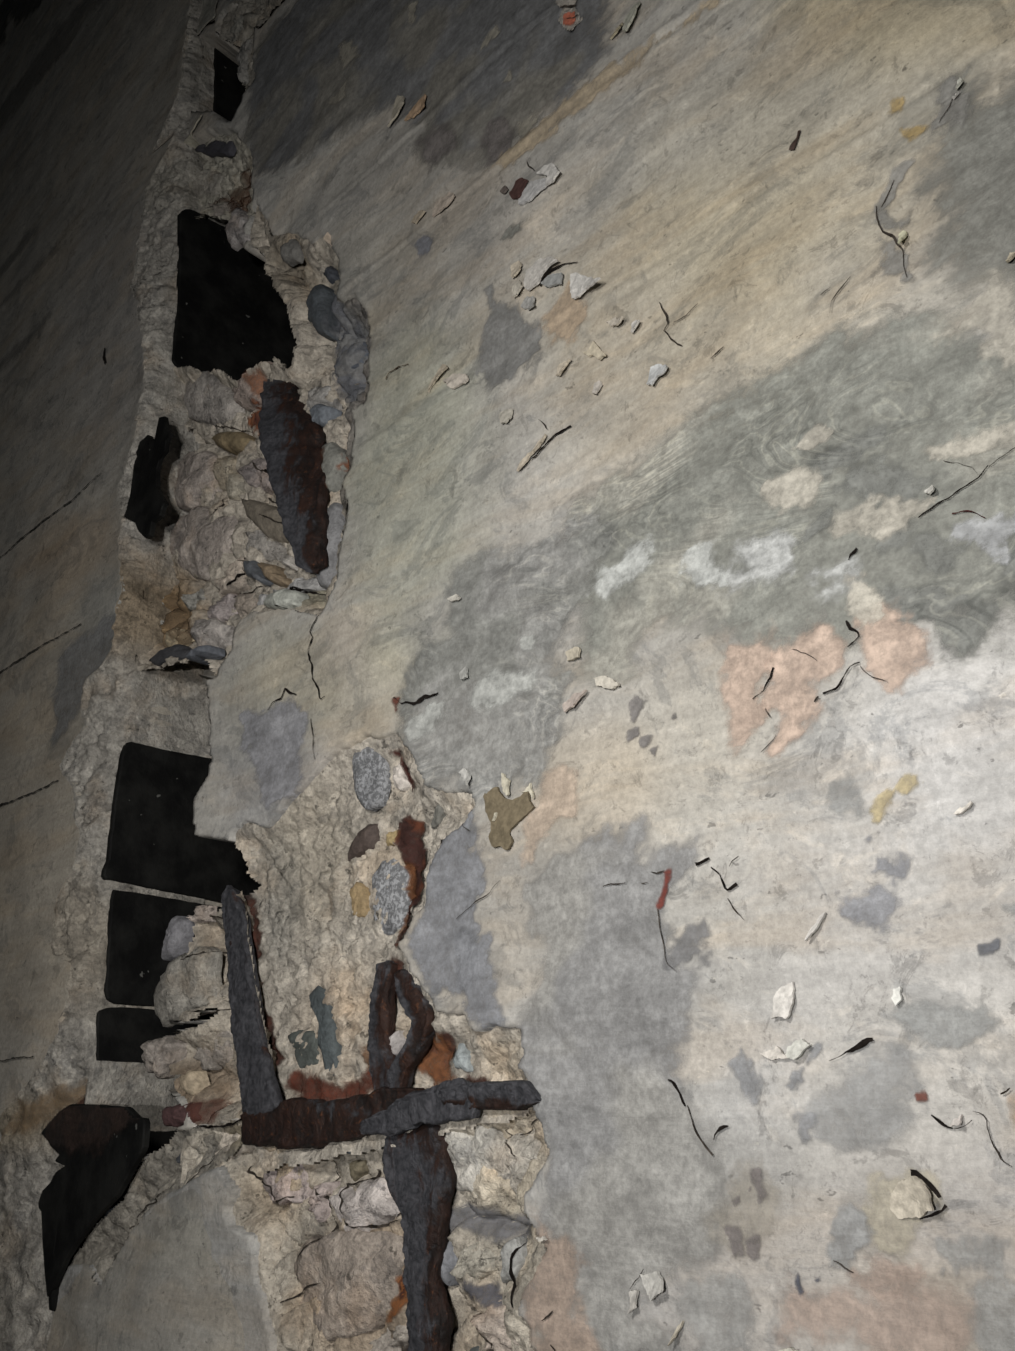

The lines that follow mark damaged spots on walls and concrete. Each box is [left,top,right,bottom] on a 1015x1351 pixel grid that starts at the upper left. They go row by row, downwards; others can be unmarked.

leakage [244,0,652,176]
peeling [500,163,560,205]
crack [876,181,907,277]
crack [918,447,1015,518]
spalling [0,0,550,1351]
crack [268,615,325,759]
peeling [562,676,620,712]
leakage [399,72,1015,1351]
crack [0,780,58,806]
corrosion [656,869,671,909]
crack [668,1079,728,1156]
crack [910,1169,947,1219]